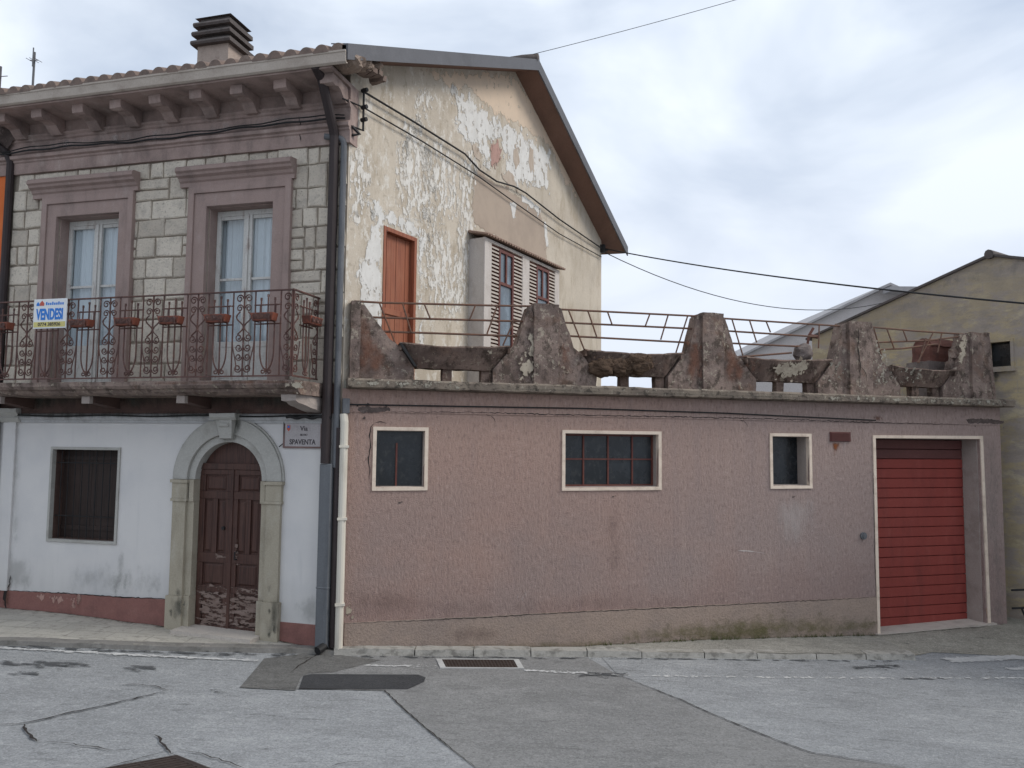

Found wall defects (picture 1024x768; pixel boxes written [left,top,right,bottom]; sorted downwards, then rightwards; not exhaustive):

peeling [349,84,551,344]
spalling [518,333,534,380]
spalling [773,356,808,382]
peeling [196,584,258,630]